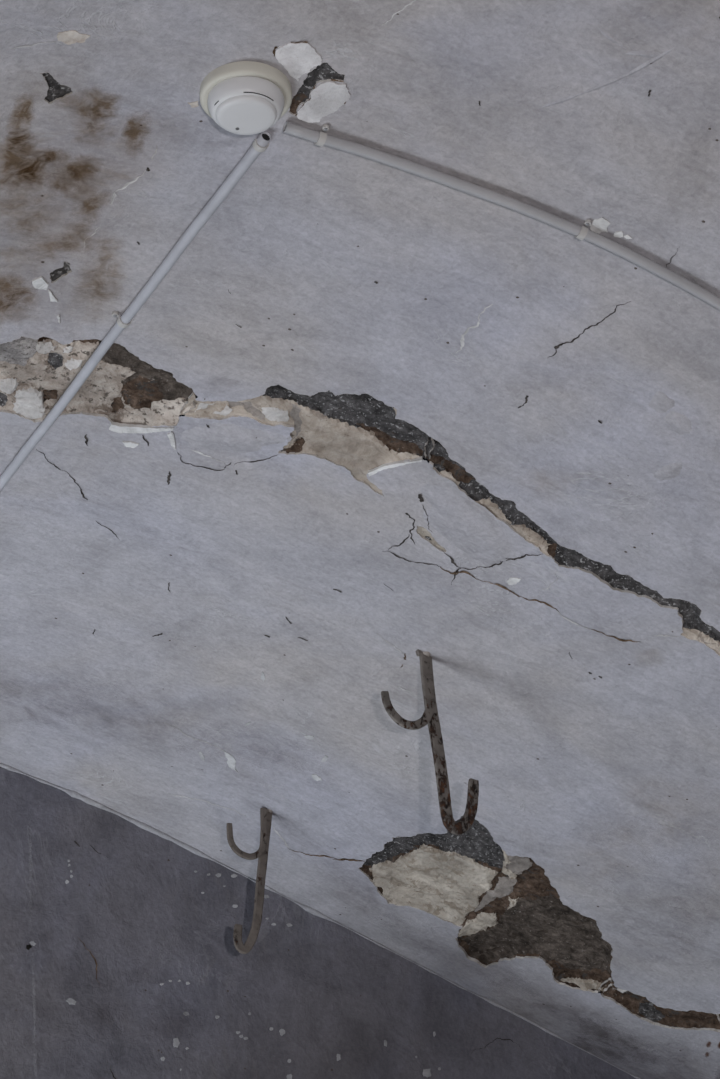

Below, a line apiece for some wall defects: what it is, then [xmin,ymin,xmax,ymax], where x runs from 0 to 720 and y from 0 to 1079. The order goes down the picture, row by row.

spalling [289,62,345,115]
spalling [32,262,72,302]
crack [550,302,628,357]
spalling [0,336,435,496]
spalling [416,526,446,552]
crack [383,436,720,656]
spalling [359,816,614,993]